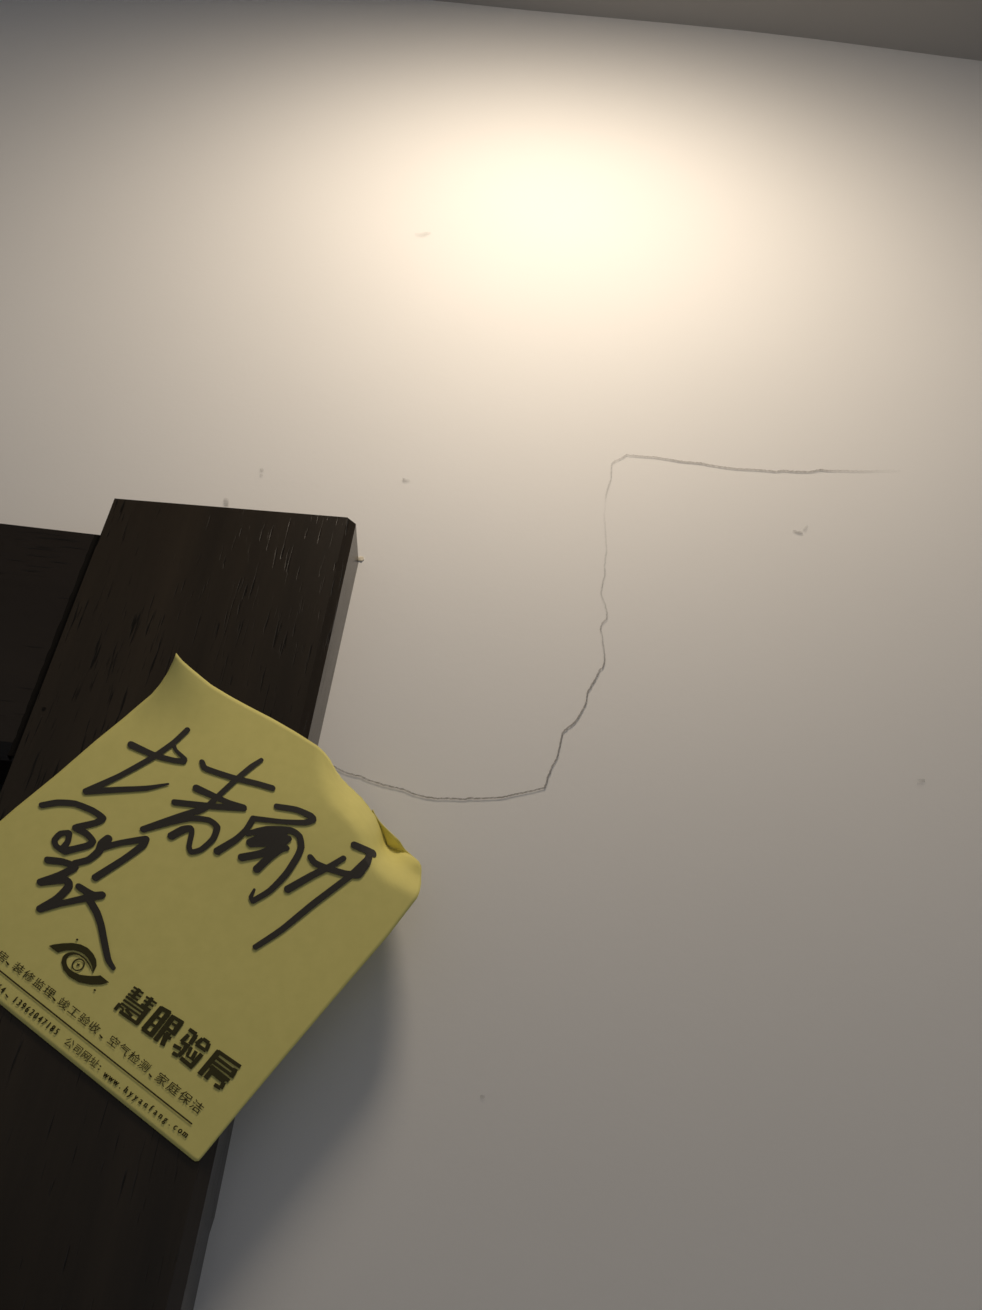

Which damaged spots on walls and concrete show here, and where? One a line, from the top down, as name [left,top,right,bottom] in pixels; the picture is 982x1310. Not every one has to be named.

crack [334,660,605,800]